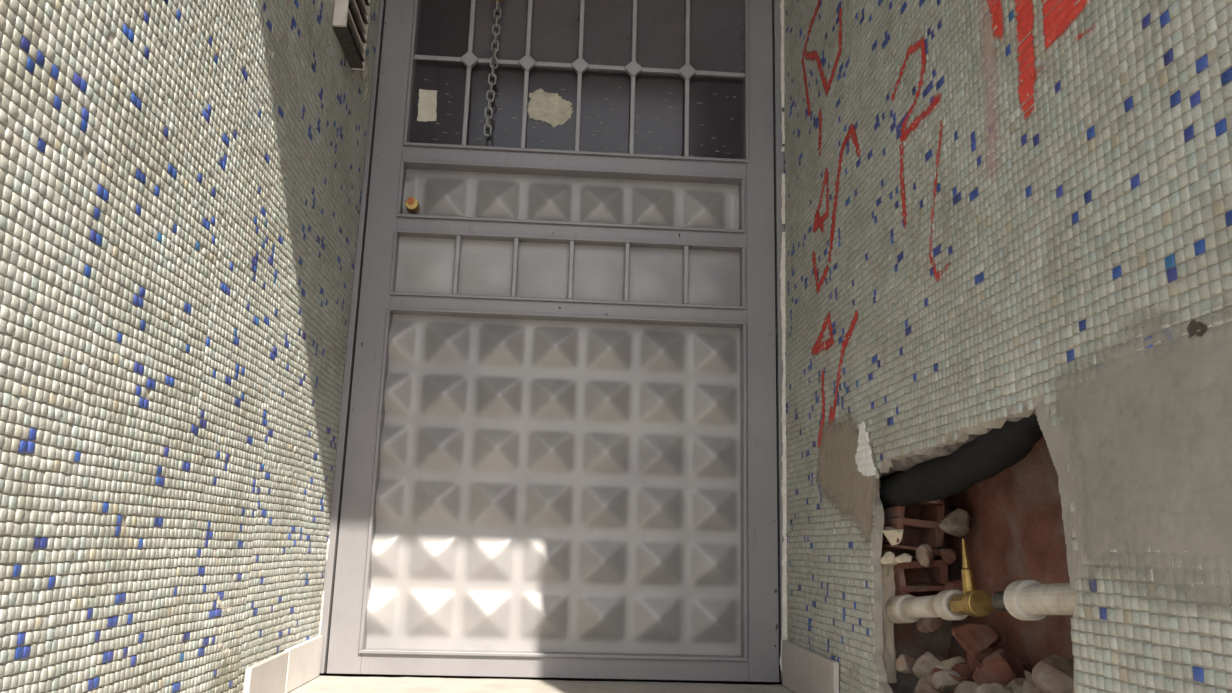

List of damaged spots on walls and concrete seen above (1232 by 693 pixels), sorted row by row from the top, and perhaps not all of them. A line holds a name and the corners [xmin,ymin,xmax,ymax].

spalling [876,436,1074,693]